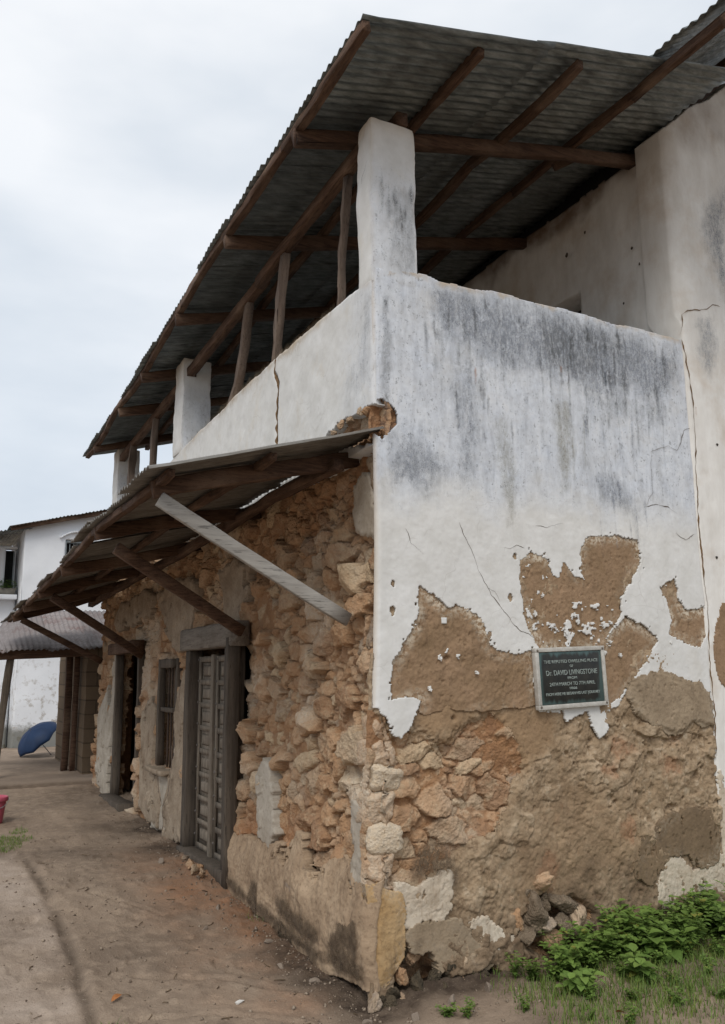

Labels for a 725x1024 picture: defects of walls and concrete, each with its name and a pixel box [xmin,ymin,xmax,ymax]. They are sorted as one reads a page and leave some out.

damp [437,294,669,394]
crack [273,359,281,444]
crack [644,304,720,752]
spalling [150,540,234,628]
spalling [90,577,186,823]
spalling [227,399,725,897]
damp [226,876,362,980]